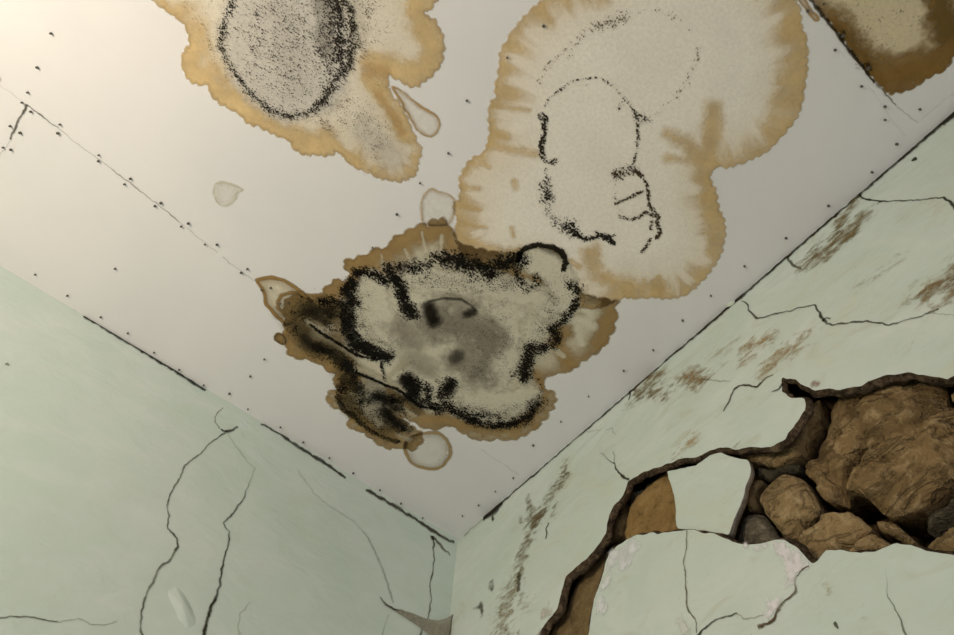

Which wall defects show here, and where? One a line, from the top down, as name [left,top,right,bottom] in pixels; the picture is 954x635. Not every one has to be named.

damp [153,0,445,183]
damp [255,0,954,470]
rust [799,199,868,270]
crack [743,301,938,326]
crack [858,193,954,209]
rust [914,264,954,304]
rust [633,371,665,401]
rust [678,365,709,390]
crack [140,411,238,635]
crack [202,495,245,635]
crack [420,536,450,635]
spalling [538,372,954,635]